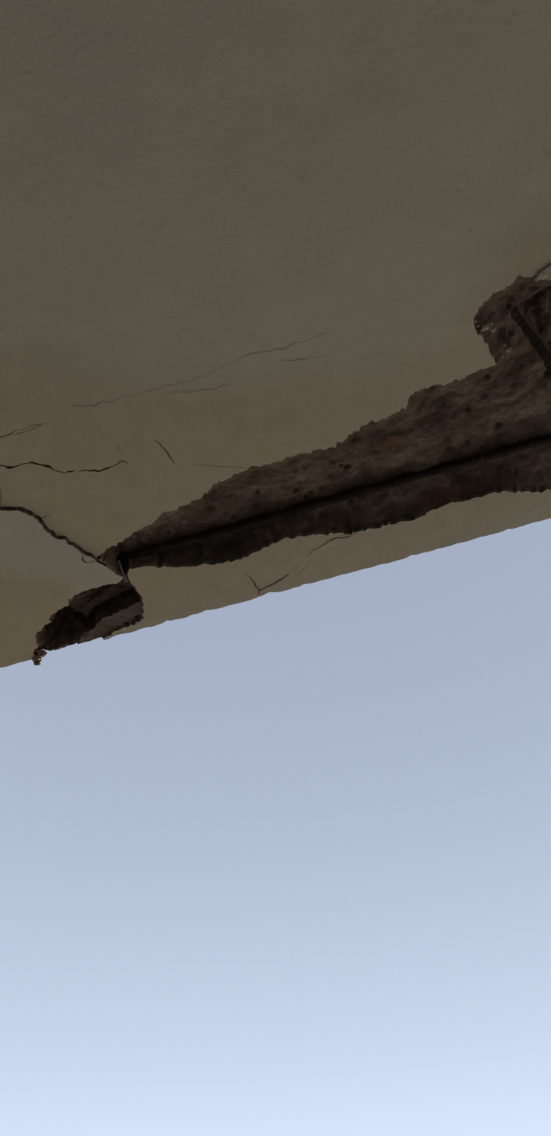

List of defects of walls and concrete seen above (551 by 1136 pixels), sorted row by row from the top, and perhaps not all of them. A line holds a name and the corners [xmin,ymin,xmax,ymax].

crack [0,448,129,563]
spalling [32,264,551,665]